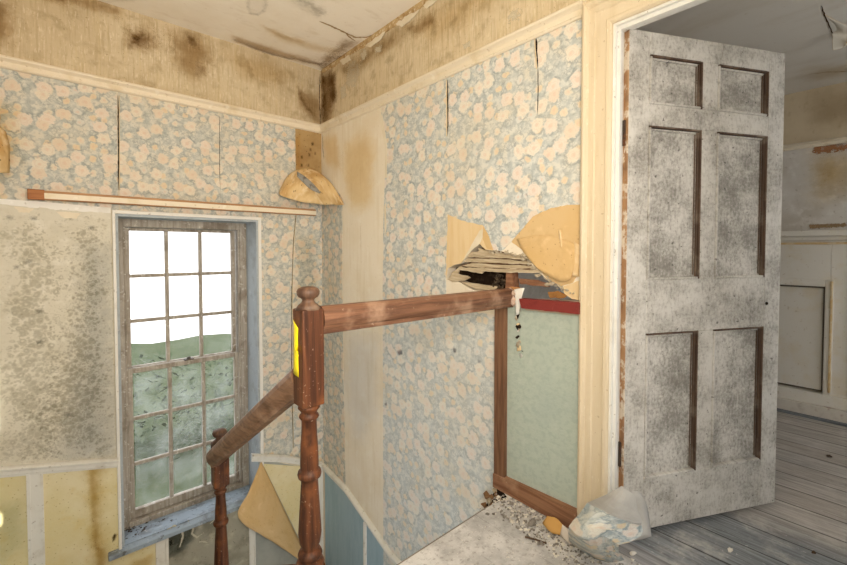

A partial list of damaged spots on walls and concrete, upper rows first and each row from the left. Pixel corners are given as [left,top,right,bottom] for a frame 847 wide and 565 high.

crack [319,21,371,41]
flaking render [322,0,437,73]
flaking render [295,128,322,174]
flaking render [812,143,847,154]
flaking render [448,227,579,307]
leakage [0,204,116,466]